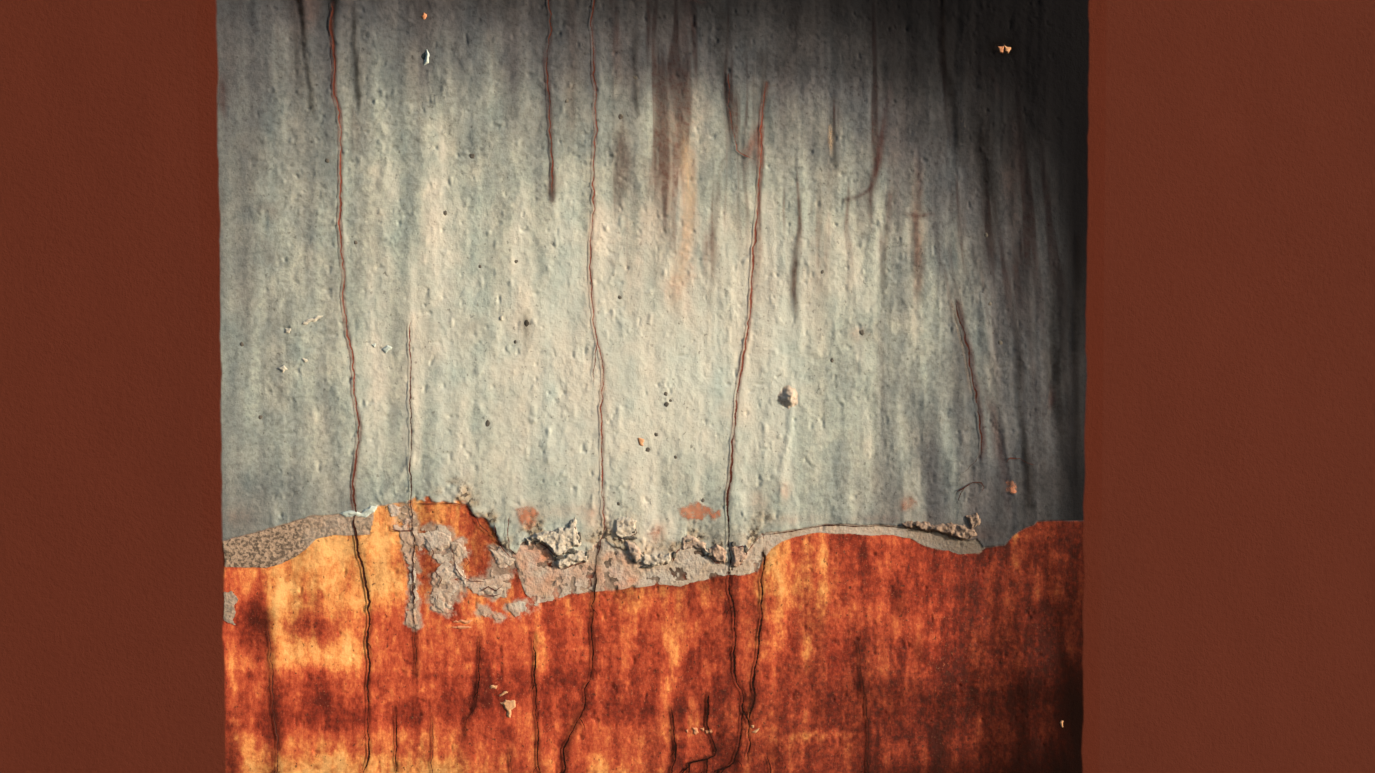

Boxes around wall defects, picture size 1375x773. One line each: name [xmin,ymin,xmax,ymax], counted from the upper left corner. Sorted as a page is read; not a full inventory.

crack [329,4,398,772]
crack [409,320,417,669]
crack [430,641,481,773]
crack [509,0,605,773]
peeling [223,498,985,629]
corrosion [222,497,1085,773]
crack [671,73,917,773]